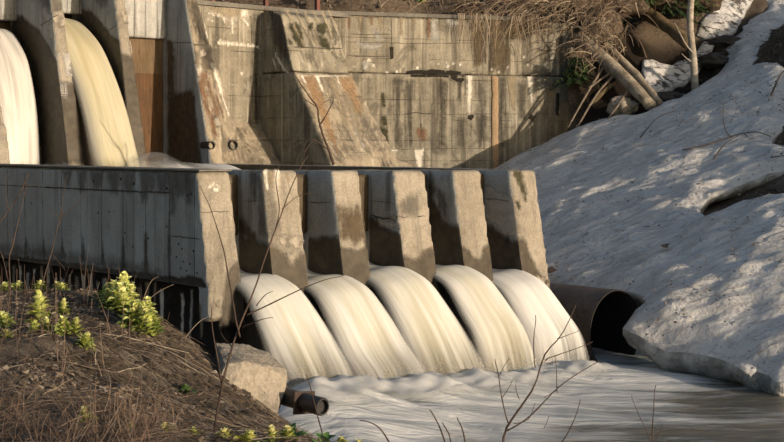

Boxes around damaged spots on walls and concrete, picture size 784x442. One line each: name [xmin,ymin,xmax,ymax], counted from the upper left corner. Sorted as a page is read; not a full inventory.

damp [271,10,347,92]
damp [223,66,551,325]
damp [0,239,164,319]
damp [181,290,203,338]